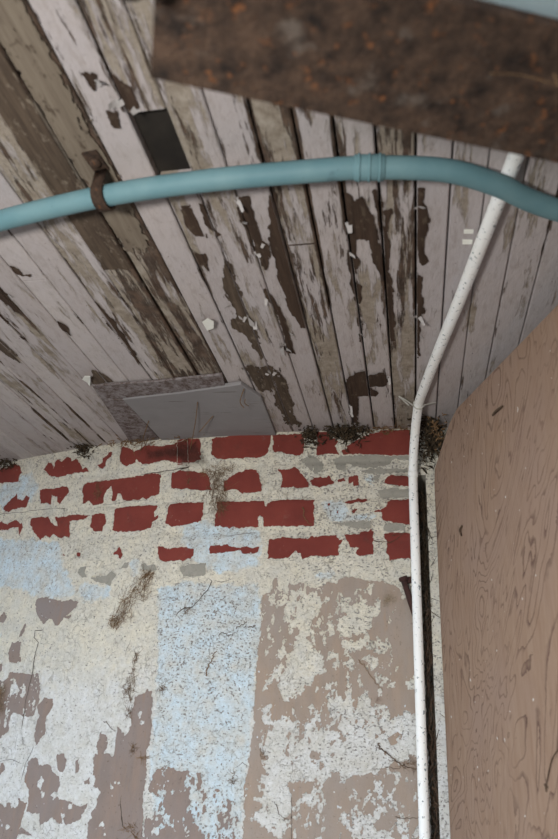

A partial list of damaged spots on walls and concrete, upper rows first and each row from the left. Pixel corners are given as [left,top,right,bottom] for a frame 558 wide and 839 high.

peeling [0,0,120,196]
peeling [67,203,153,270]
peeling [181,203,221,238]
peeling [195,253,209,271]
peeling [235,193,305,356]
peeling [343,189,396,342]
peeling [413,187,431,358]
peeling [0,260,421,578]
peeling [76,546,130,587]
peeling [0,576,423,839]